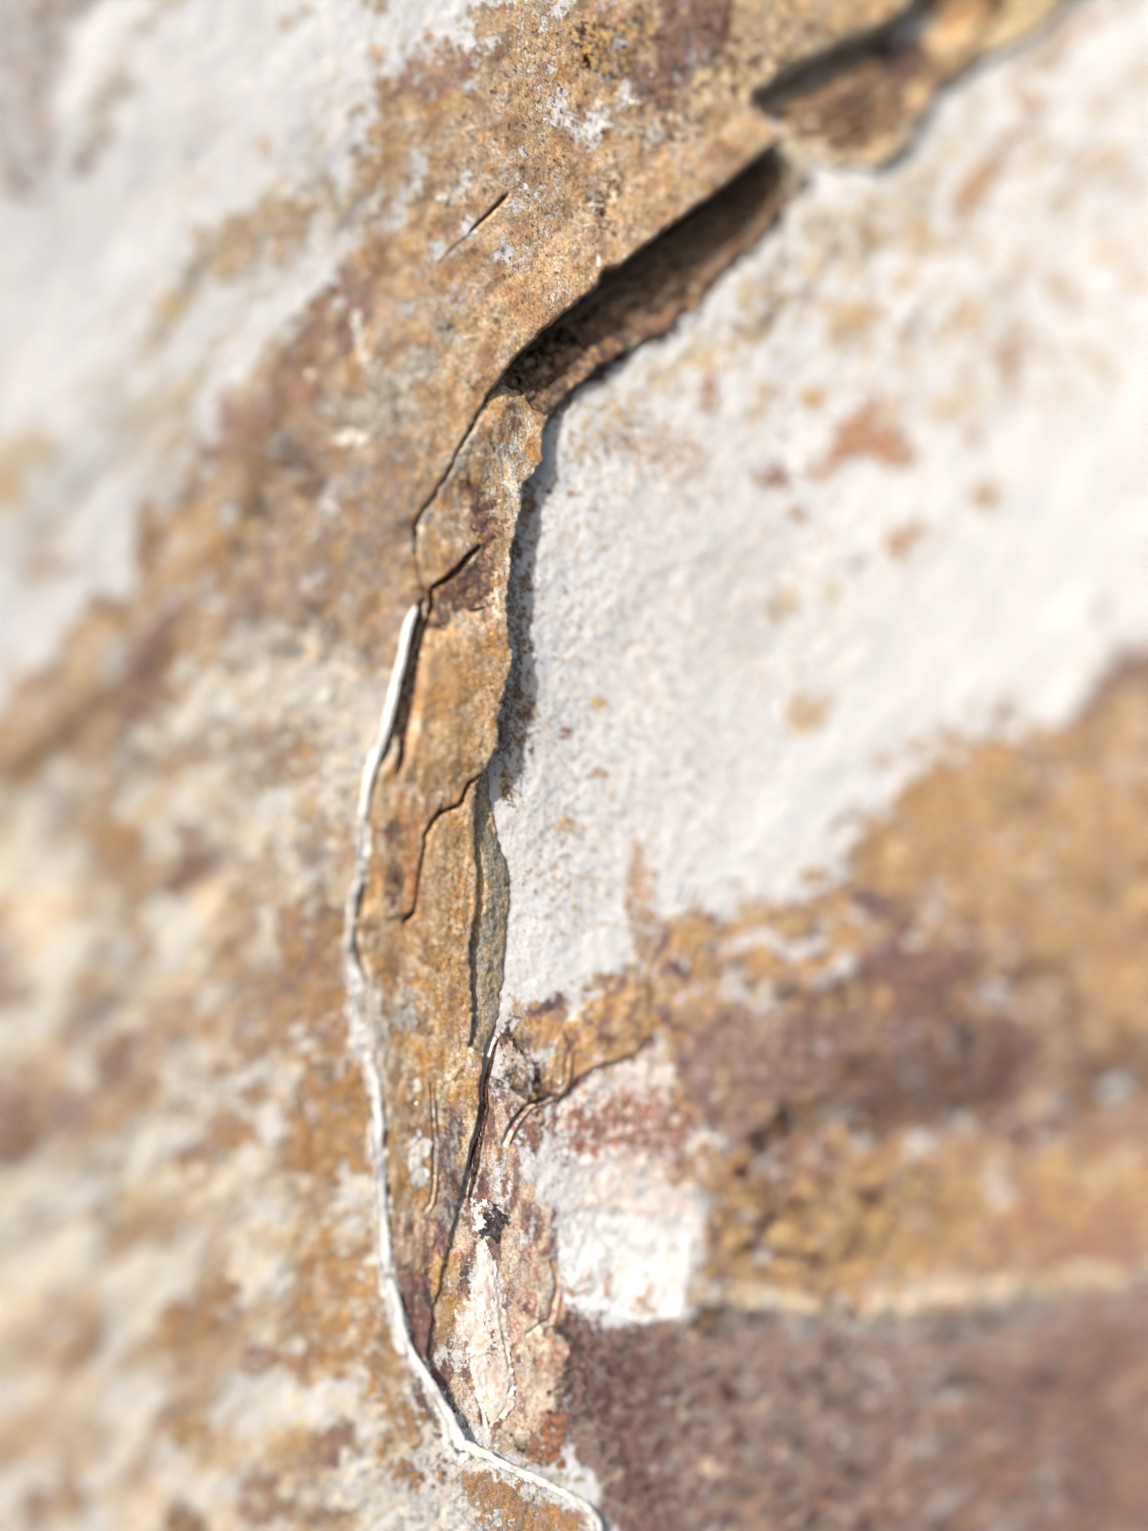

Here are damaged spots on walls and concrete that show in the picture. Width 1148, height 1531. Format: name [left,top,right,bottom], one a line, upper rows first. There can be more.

crack [437,199,502,263]
crack [343,549,605,1531]